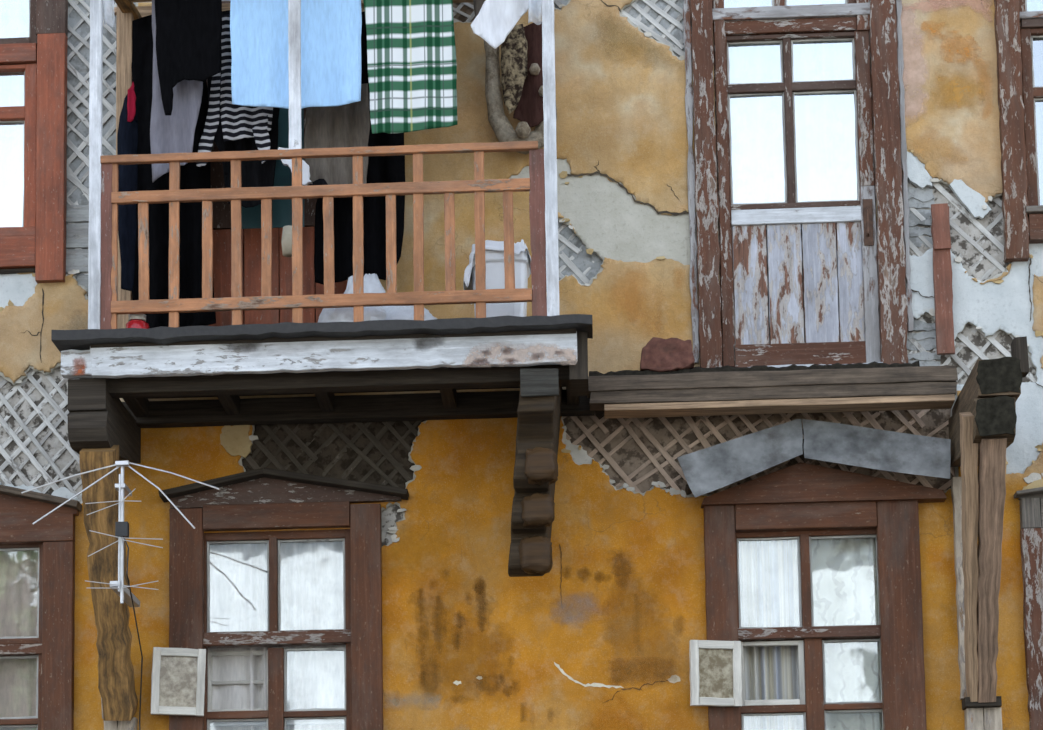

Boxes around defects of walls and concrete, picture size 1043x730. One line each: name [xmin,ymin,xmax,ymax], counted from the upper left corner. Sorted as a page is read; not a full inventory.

spalling [554,0,568,10]
spalling [621,0,692,61]
peeling [557,159,697,286]
crack [567,161,689,216]
peeling [0,273,40,313]
crack [24,289,44,363]
peeling [901,149,1043,474]
spalling [0,367,82,502]
spalling [220,420,427,488]
spalling [561,405,956,498]
spalling [381,505,407,546]
crack [554,662,668,703]